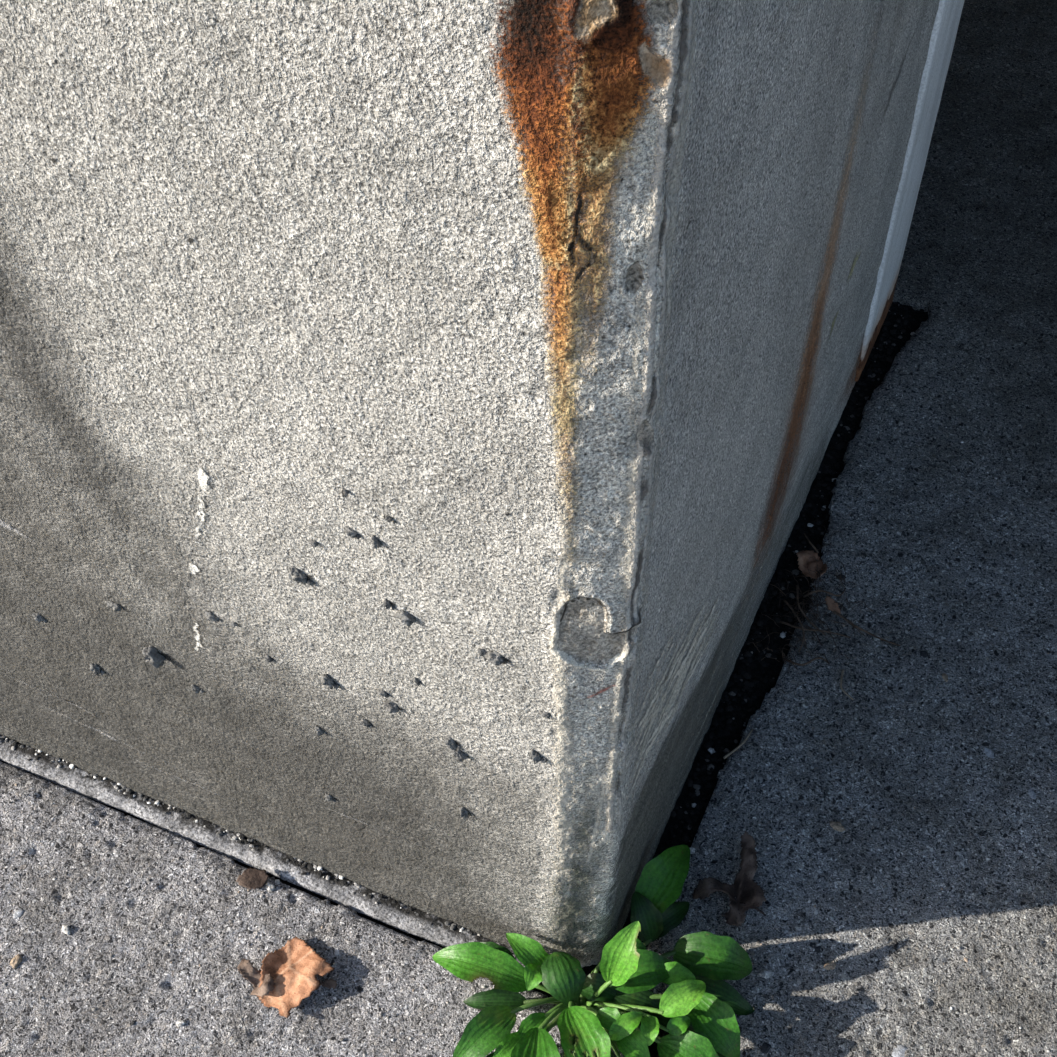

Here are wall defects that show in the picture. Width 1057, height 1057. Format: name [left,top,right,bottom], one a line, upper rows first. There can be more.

corrosion [492,0,653,554]
crack [568,193,597,283]
spalling [550,597,641,671]
crack [606,0,694,833]
corrosion [754,88,864,567]